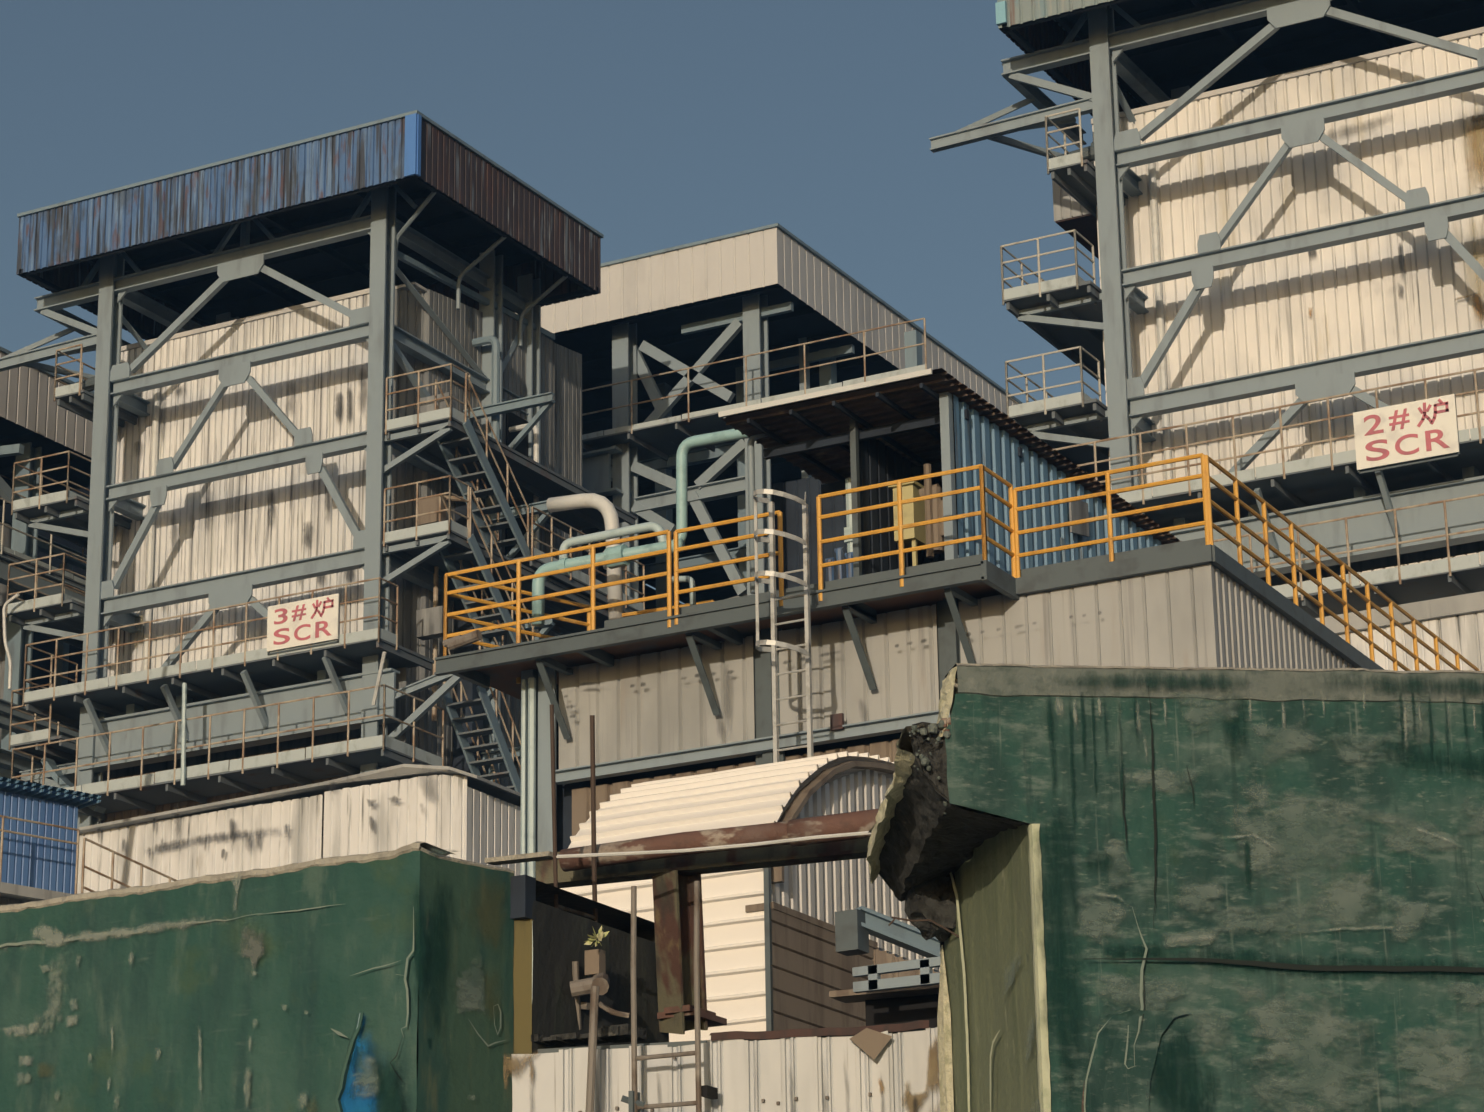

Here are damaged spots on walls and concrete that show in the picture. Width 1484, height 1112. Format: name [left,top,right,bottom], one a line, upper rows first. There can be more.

water stain [336,390,351,421]
water stain [1363,677,1484,775]
water stain [149,807,263,858]
spalling [879,666,957,901]
water stain [1039,674,1251,1069]
crack [0,904,341,947]